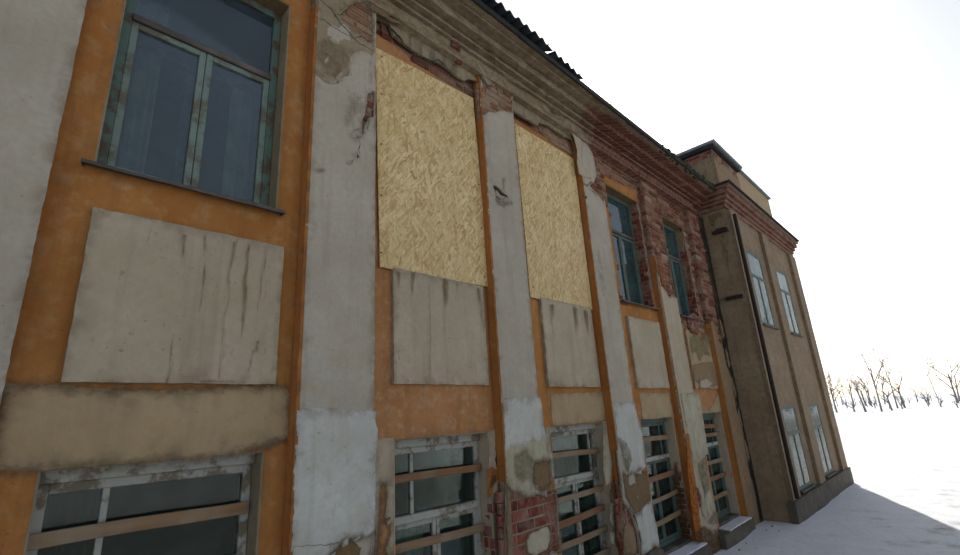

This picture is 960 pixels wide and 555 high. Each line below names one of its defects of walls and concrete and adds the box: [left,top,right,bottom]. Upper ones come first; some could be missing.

crack [319,1,369,49]
crack [387,25,465,85]
flaking render [380,23,513,118]
peeling [330,482,392,555]
flaking render [483,459,562,555]
flaking render [609,469,664,555]